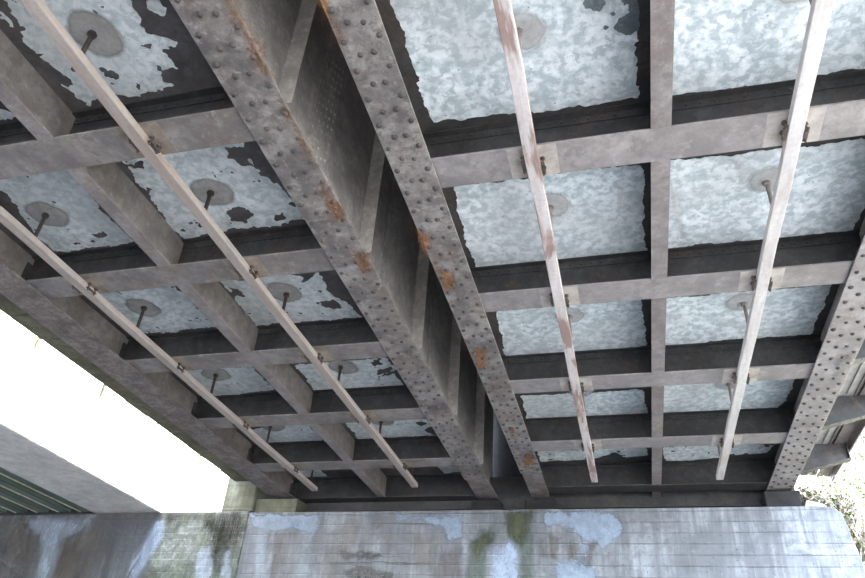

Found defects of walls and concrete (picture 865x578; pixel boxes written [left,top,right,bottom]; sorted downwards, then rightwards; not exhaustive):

peeling [0,0,97,106]
peeling [43,0,178,97]
peeling [390,0,516,123]
peeling [511,0,640,113]
peeling [0,109,15,120]
peeling [122,158,208,239]
peeling [163,143,304,232]
peeling [220,272,362,326]
efflorescence [493,543,517,578]
peeling [544,510,623,578]